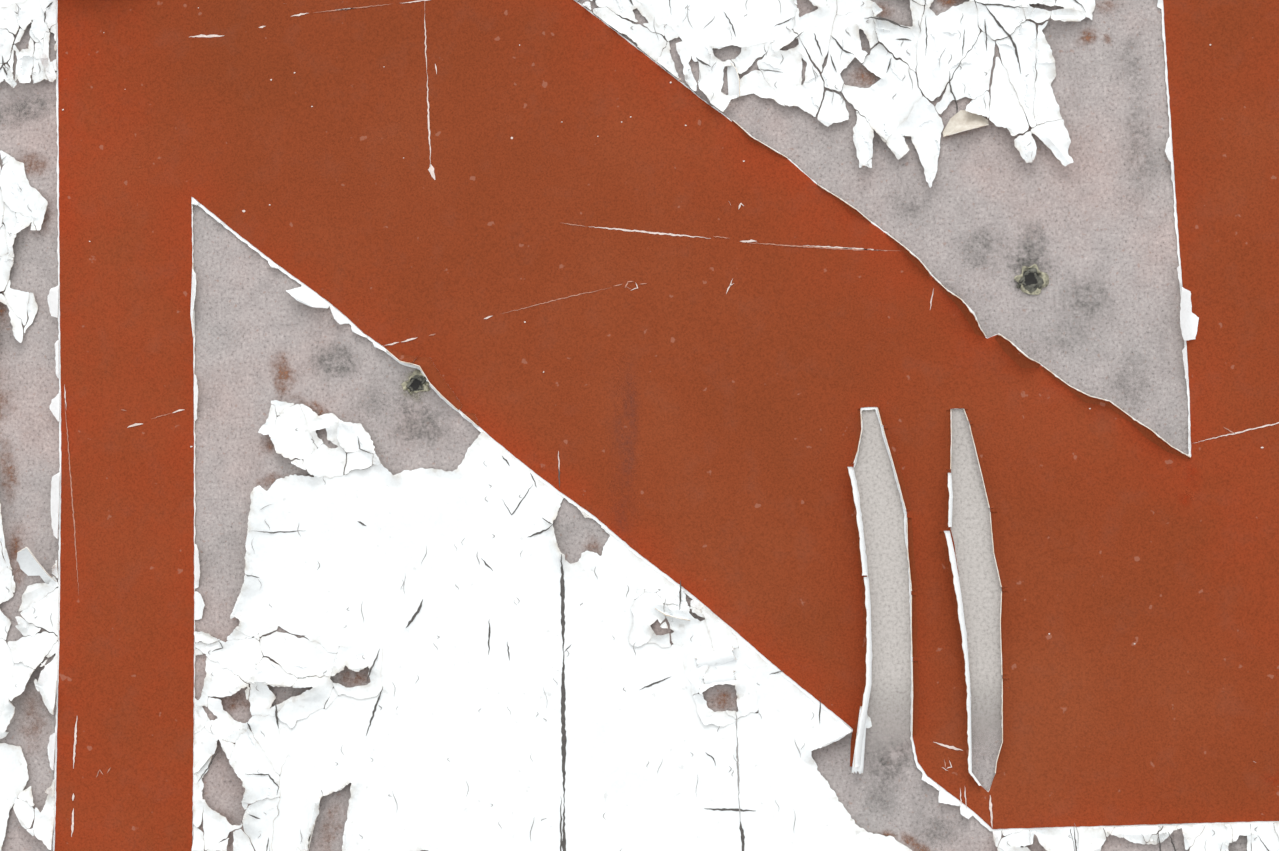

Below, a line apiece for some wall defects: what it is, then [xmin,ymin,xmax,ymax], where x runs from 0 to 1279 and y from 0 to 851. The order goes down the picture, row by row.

peeling [0,0,57,88]
crack [775,18,852,72]
peeling [583,0,1095,188]
crack [867,2,927,73]
crack [949,1,1027,113]
peeling [0,150,59,343]
peeling [286,285,386,352]
peeling [0,503,59,851]
crack [502,456,571,851]
peeling [192,400,912,851]
peeling [922,772,973,819]
peeling [993,822,1279,851]